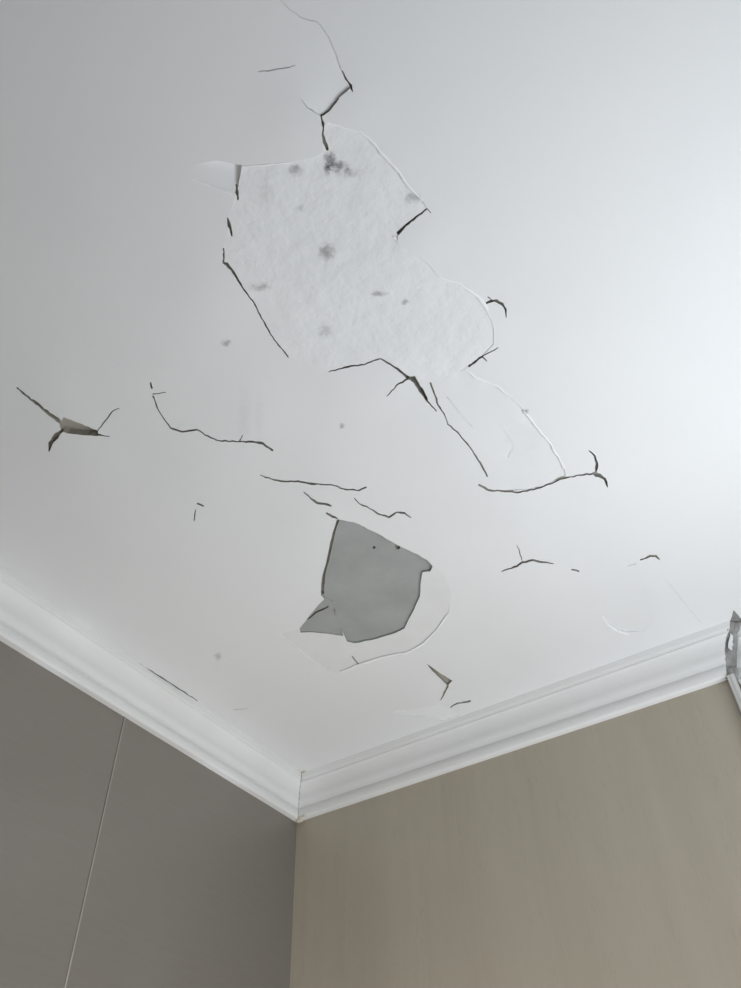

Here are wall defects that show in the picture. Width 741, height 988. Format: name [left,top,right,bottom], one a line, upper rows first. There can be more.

crack [281,0,353,151]
crack [391,208,431,235]
crack [222,184,289,358]
crack [486,297,507,317]
crack [468,347,498,367]
crack [150,382,273,451]
crack [329,358,608,493]
crack [261,475,411,519]
crack [501,546,579,572]
flaking render [280,519,451,673]